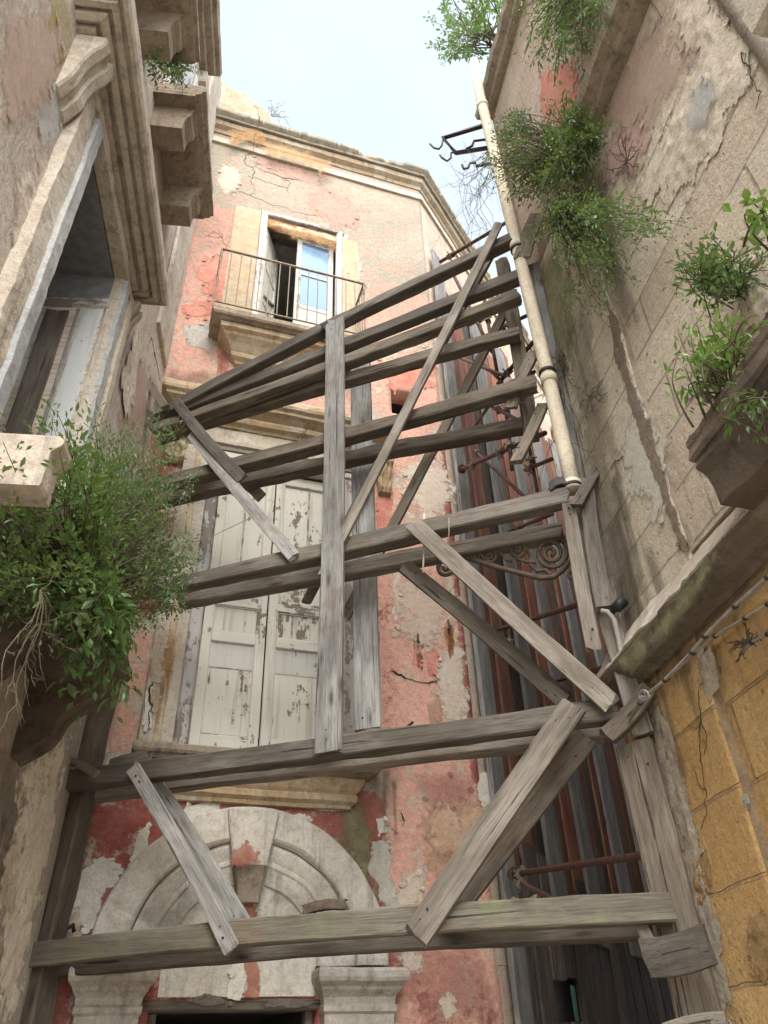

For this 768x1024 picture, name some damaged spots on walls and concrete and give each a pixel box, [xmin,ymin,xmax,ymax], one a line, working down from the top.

peeling [538,58,580,126]
crack [231,106,321,217]
peeling [181,255,233,355]
peeling [375,455,456,529]
crack [385,669,439,686]
peeling [391,572,471,723]
peeling [476,772,490,807]
crack [693,690,708,829]
peeling [67,822,152,938]
peeling [367,816,427,906]
peeling [187,963,311,1008]
peeling [397,951,423,974]